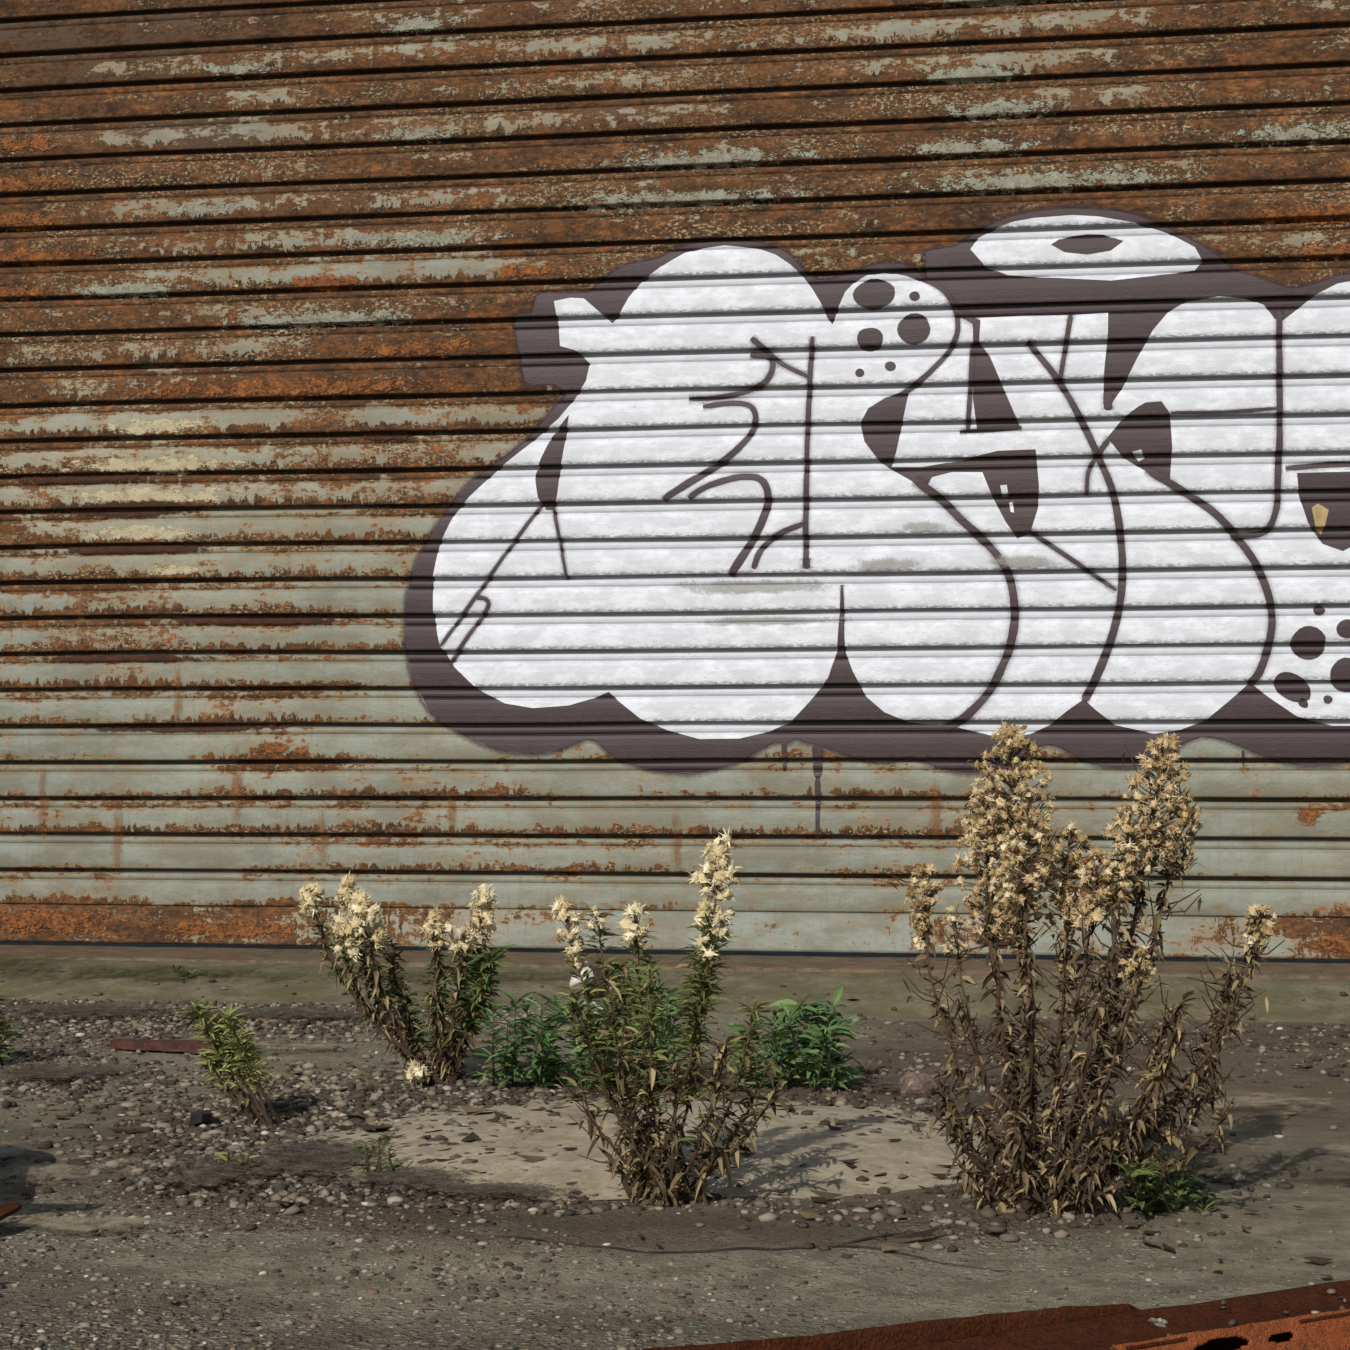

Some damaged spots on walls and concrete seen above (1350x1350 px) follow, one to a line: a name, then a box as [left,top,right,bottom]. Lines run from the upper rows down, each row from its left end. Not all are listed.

peeling [565,146,824,171]
peeling [894,137,1054,161]
corrosion [0,174,69,195]
peeling [888,166,1207,198]
peeling [538,185,828,213]
corrosion [1200,202,1350,226]
corrosion [0,212,96,267]
corrosion [1265,242,1350,261]
corrosion [0,283,53,302]
peeling [89,416,217,436]
peeling [51,454,260,503]
corrosion [0,908,118,935]